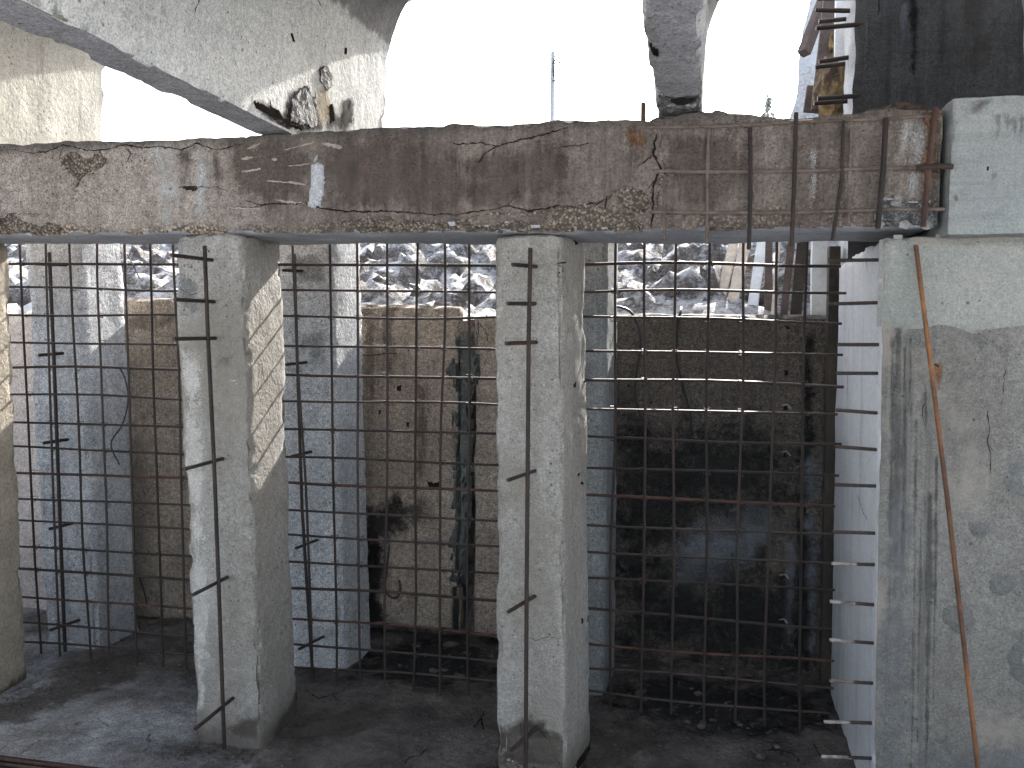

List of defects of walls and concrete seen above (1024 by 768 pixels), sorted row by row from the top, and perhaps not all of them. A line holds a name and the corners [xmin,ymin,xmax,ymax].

spalling [61,150,108,188]
crack [15,142,244,162]
spalling [253,65,354,161]
crack [451,128,590,164]
crack [636,129,670,229]
spalling [278,91,954,768]
spalling [0,213,235,750]
leakage [888,329,938,666]
leakage [583,335,834,768]